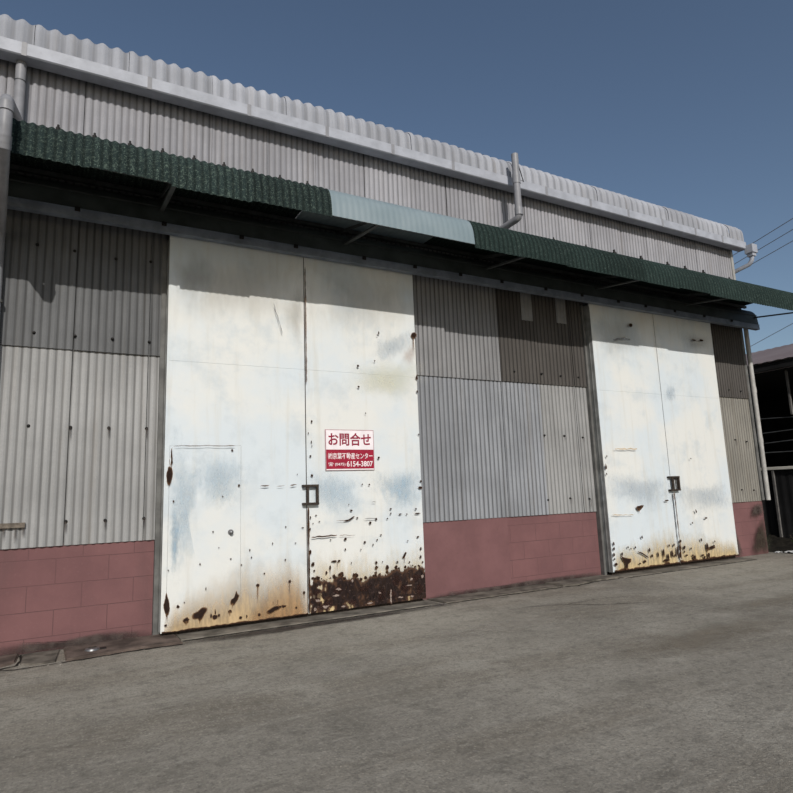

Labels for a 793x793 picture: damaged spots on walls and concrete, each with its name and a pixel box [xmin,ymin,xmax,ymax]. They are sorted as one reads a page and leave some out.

corrosion [166,445,188,485]
corrosion [162,508,426,634]
corrosion [613,492,739,572]